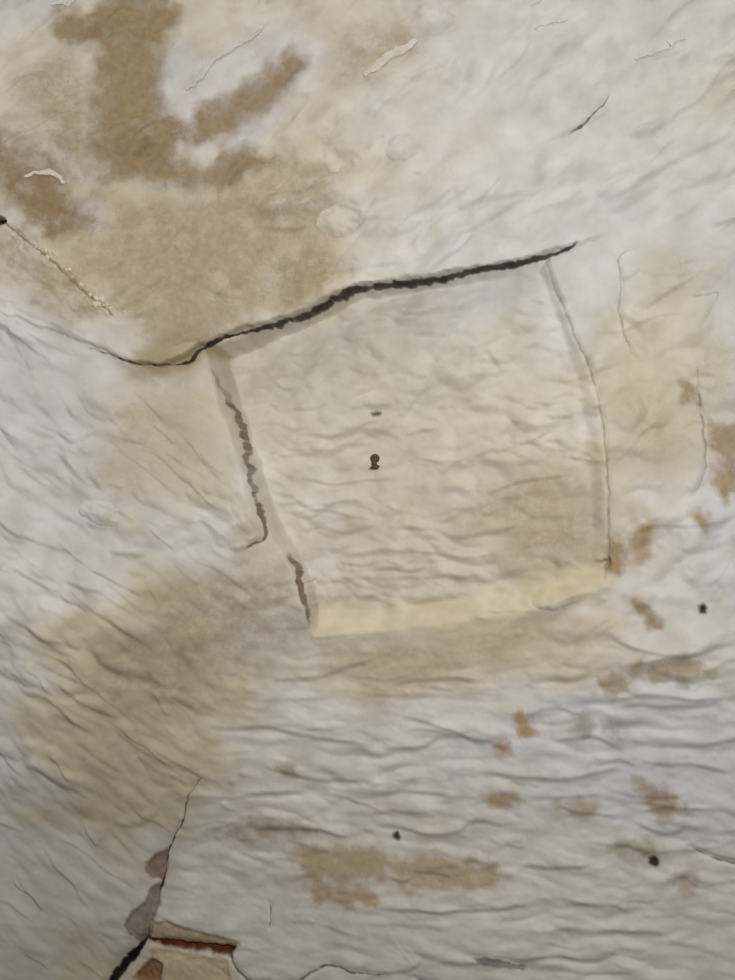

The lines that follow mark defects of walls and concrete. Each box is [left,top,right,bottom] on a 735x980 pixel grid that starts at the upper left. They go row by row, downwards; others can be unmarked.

water stain [55,0,303,185]
water stain [0,142,88,241]
water stain [82,182,328,340]
crack [176,245,574,365]
crack [160,819,184,890]
crack [109,935,174,980]